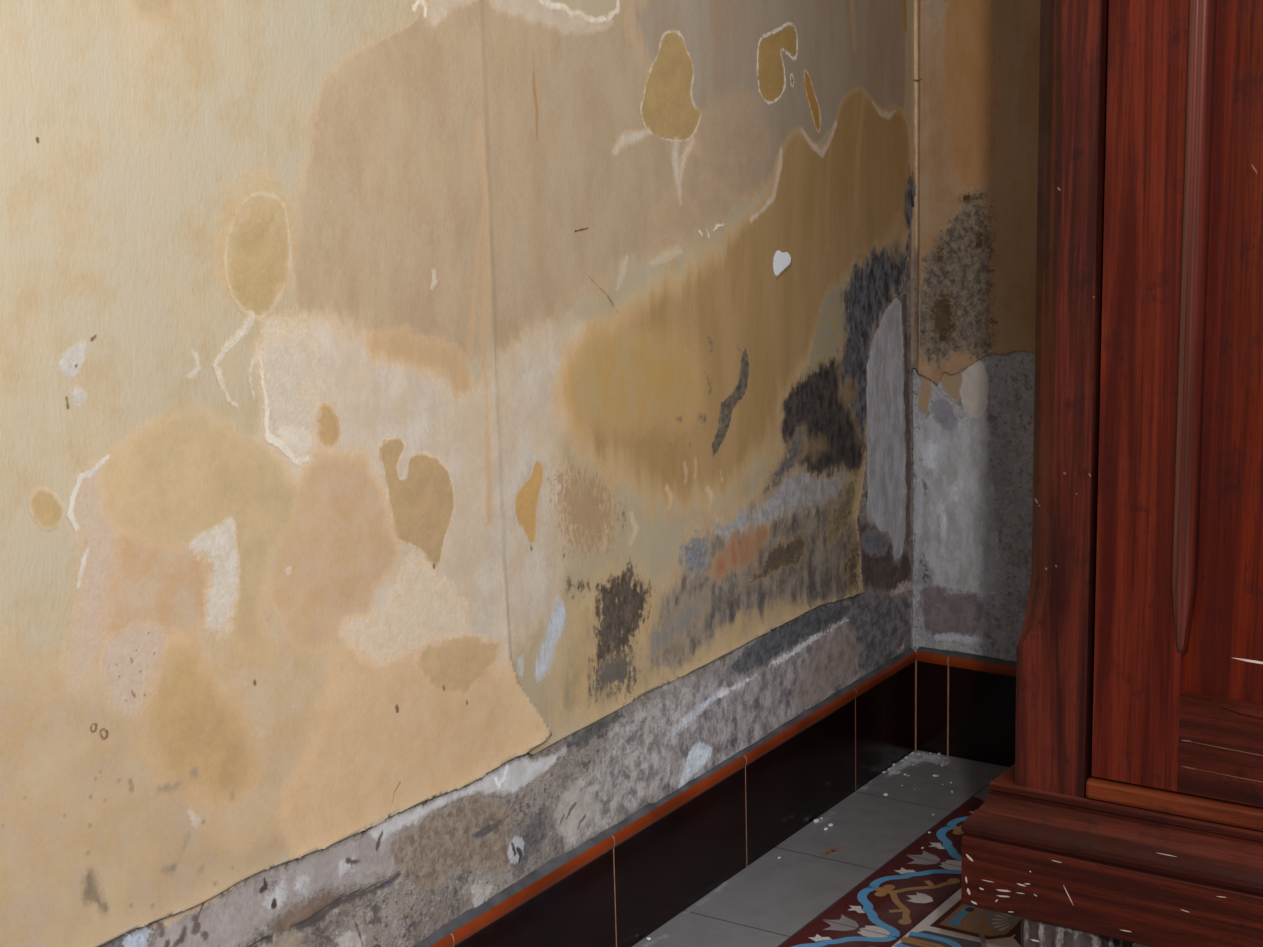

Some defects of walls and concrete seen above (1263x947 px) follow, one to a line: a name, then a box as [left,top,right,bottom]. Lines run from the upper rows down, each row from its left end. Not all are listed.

peeling [773,250,792,280]
peeling [866,297,999,598]
leakage [0,0,998,947]
peeling [370,749,566,851]
peeling [555,788,598,838]
peeling [507,836,524,864]
peeling [338,855,360,880]
peeling [259,870,311,912]
peeling [470,881,492,908]
spalling [122,914,219,947]
peeling [334,930,381,947]